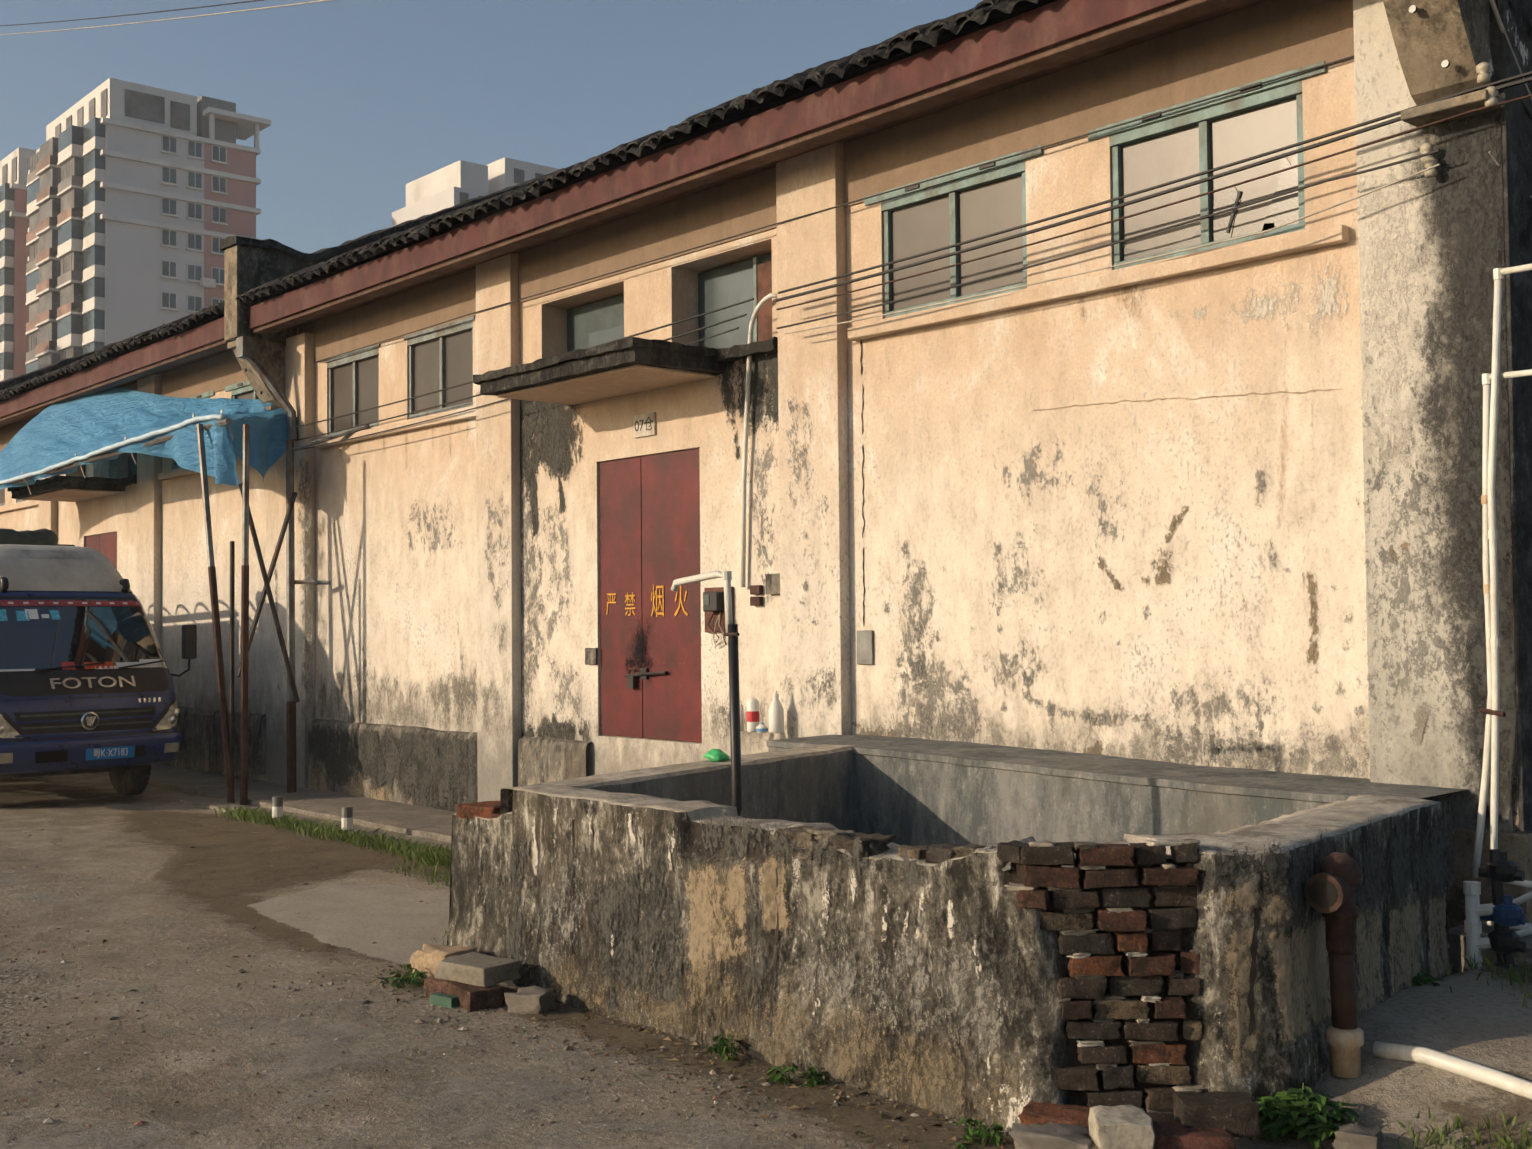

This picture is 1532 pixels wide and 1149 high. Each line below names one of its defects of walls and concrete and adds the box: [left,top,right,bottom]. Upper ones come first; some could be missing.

leakage [298,400,590,812]
leakage [717,340,829,626]
spalling [1083,741,1102,755]
peeling [1097,556,1125,591]
peeling [1136,505,1188,586]
leakage [863,0,1530,1064]
leakage [502,806,1022,1134]